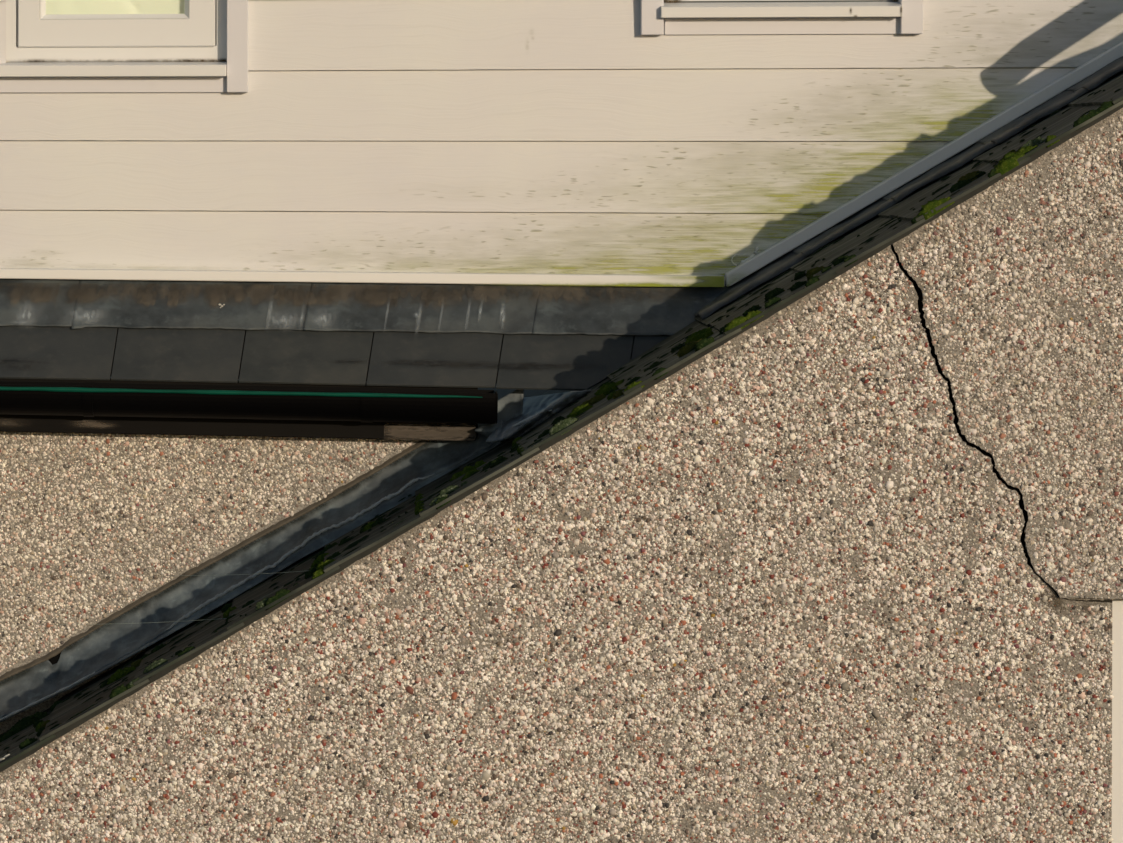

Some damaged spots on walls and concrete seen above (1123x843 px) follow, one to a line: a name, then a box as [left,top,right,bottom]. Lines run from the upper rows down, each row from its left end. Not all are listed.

crack [891,244,1112,603]